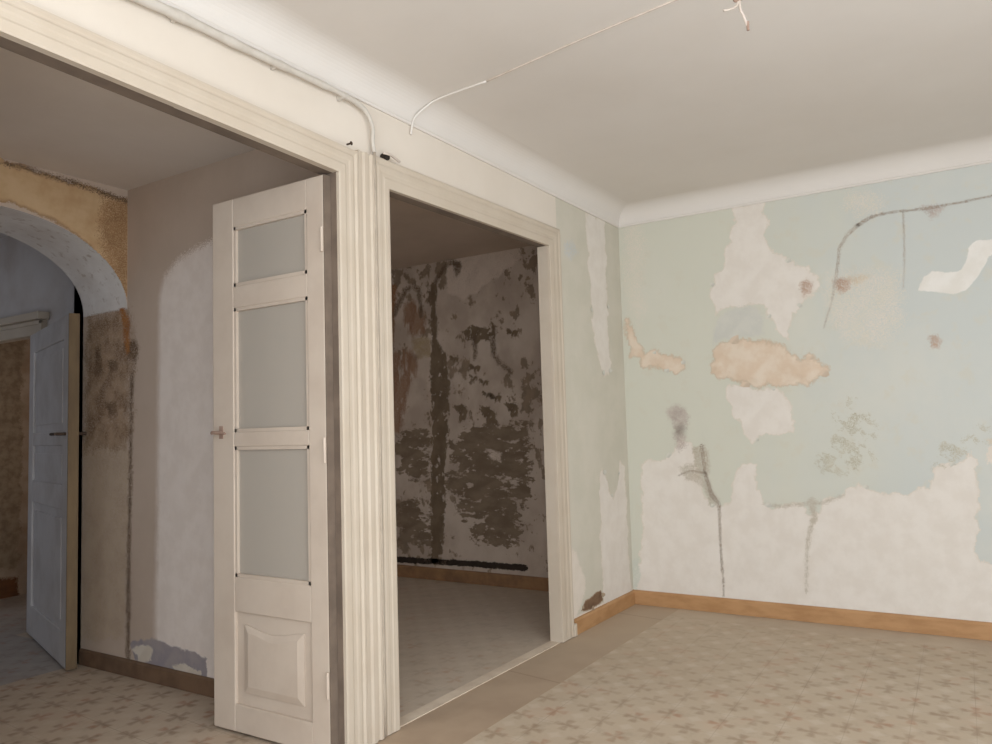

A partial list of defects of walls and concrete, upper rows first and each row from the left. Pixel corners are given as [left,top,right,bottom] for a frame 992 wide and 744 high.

flaking render [0,157,128,296]
peeling [585,212,612,378]
peeling [708,202,820,341]
peeling [725,384,796,444]
flaking render [81,425,207,677]
crack [679,444,725,597]
peeling [571,438,992,622]